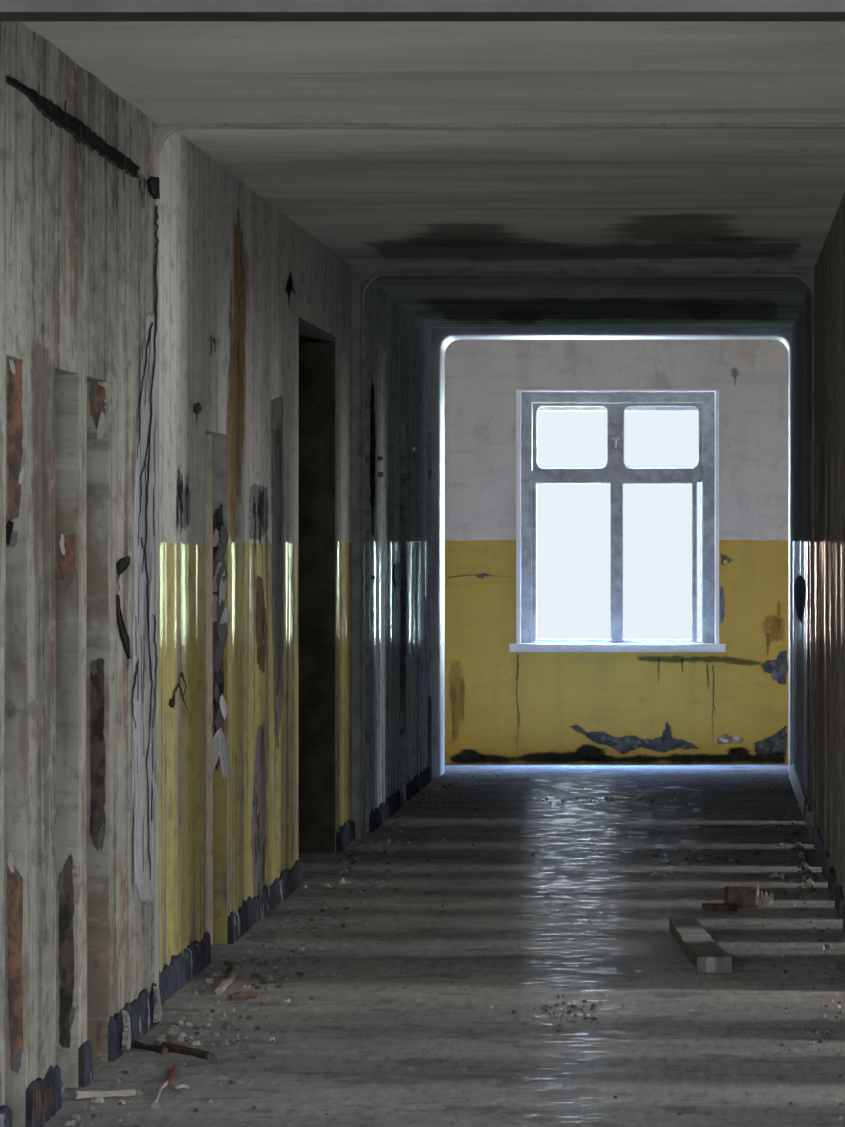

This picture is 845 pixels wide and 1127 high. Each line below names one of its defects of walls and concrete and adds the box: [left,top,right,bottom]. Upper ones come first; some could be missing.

damp [638,656,759,688]
peeling [761,651,789,684]
damp [450,744,786,764]
peeling [571,723,698,754]
peeling [717,726,787,756]